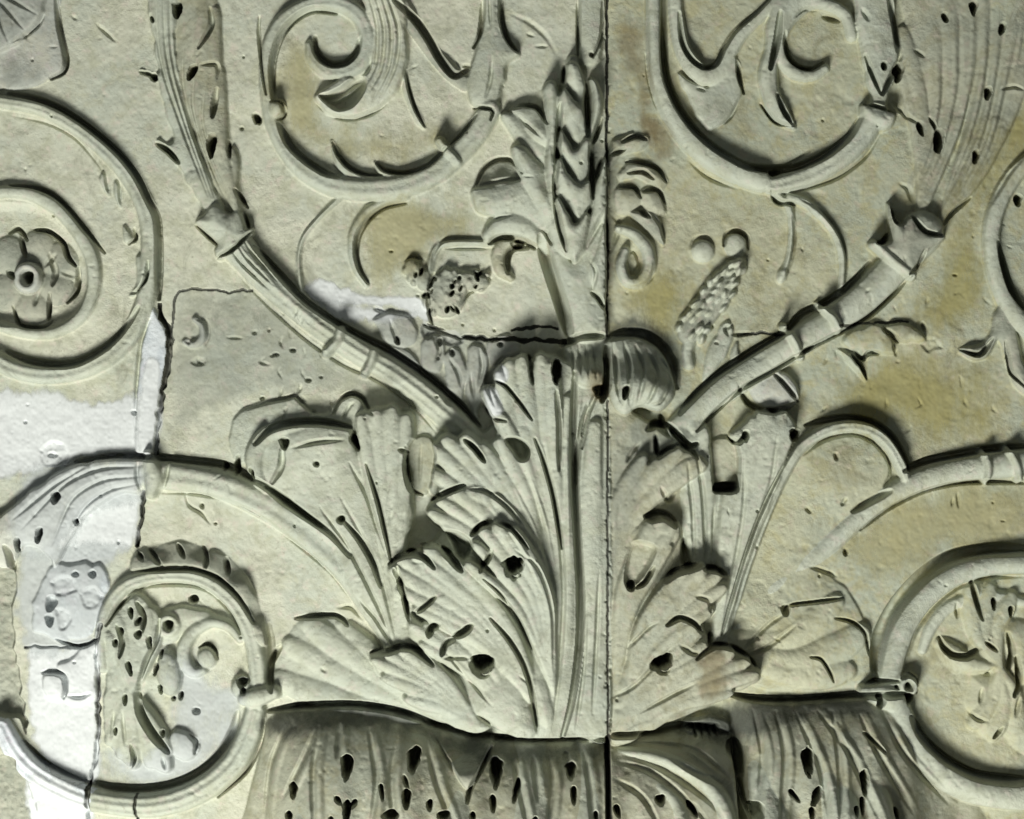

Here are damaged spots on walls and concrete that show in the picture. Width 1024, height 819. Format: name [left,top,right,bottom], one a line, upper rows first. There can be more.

crack [427,323,567,345]
crack [150,287,253,455]
crack [135,490,146,547]
crack [62,623,103,649]
crack [95,668,103,750]
crack [84,781,93,809]
crack [132,792,140,819]